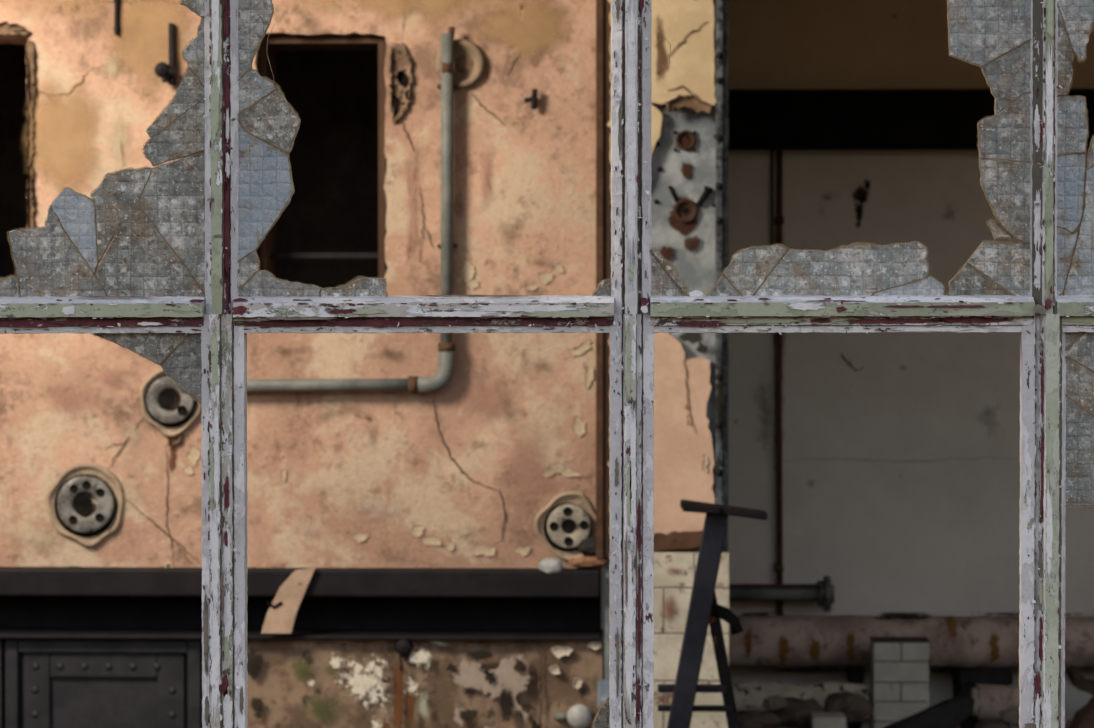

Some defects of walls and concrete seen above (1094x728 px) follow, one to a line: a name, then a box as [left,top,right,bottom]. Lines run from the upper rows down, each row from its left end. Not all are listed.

spalling [665,95,713,114]
peeling [1033,0,1064,310]
peeling [230,260,624,357]
crack [105,417,144,469]
crack [124,454,200,567]
crack [433,400,506,541]
peeling [669,290,1064,728]
peeling [588,404,652,723]
peeling [453,707,466,727]
peeling [450,653,530,723]
peeling [549,646,574,675]